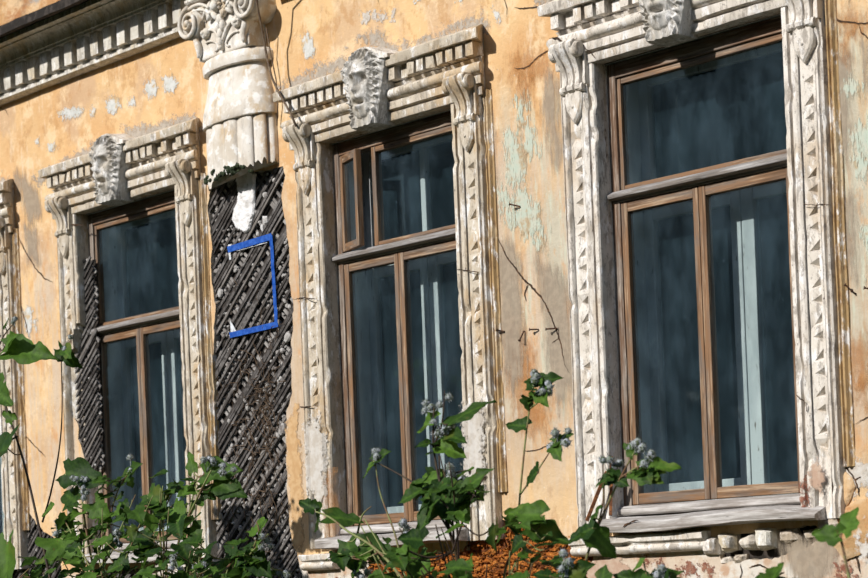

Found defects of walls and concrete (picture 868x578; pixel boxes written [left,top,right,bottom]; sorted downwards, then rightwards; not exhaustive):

peeling [301,32,315,59]
crack [836,18,868,39]
peeling [56,73,179,122]
peeling [840,71,865,97]
peeling [496,89,548,253]
peeling [848,117,868,184]
crack [498,239,569,372]
flaking render [209,166,328,578]
peeling [839,459,868,507]